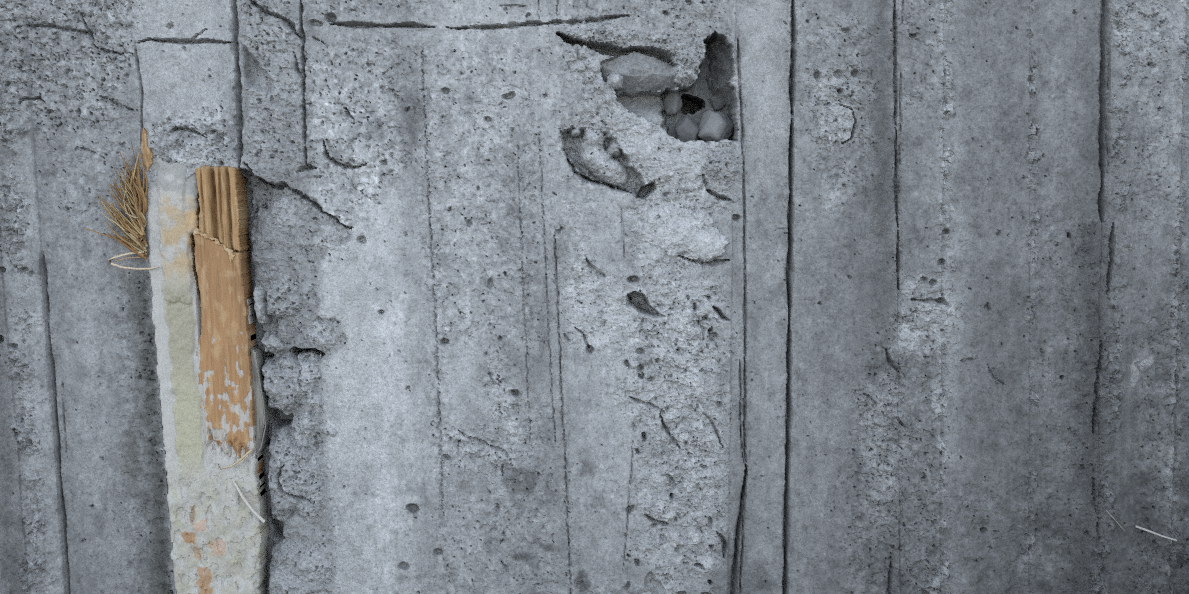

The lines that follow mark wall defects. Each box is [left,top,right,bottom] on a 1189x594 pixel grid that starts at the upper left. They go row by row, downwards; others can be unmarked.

spalling [150,0,353,594]
peeling [322,106,388,172]
crack [298,0,631,512]
crack [500,561,511,574]
crack [517,139,575,594]
spalling [555,0,746,594]
crack [717,37,750,594]
crack [776,0,800,594]
crack [1091,478,1103,541]
crack [1091,341,1106,435]
crack [1095,0,1158,297]